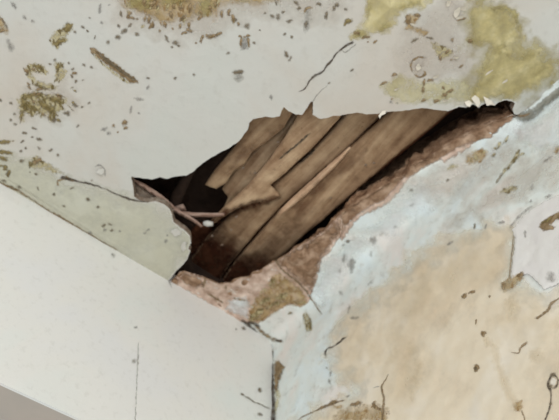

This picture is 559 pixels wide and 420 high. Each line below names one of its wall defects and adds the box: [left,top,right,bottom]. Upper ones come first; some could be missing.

water stain [124,0,240,32]
water stain [351,0,426,43]
spalling [90,48,138,83]
crack [301,42,355,96]
water stain [381,0,559,103]
peeling [464,95,495,107]
spalling [176,113,514,330]
peeling [509,195,559,289]
water stain [311,221,559,420]
crack [242,320,282,420]
crack [545,373,559,420]